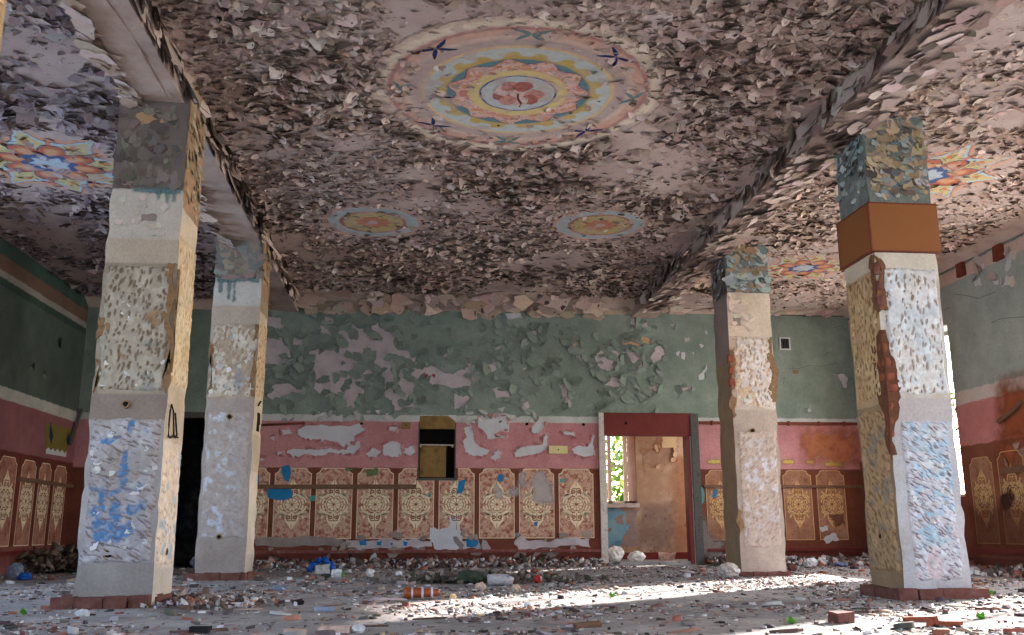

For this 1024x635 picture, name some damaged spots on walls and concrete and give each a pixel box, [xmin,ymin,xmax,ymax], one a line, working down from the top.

peeling [0,0,1024,463]
spalling [199,412,432,558]
peeling [453,529,491,555]
peeling [513,531,591,558]
spalling [736,428,782,548]
damp [801,430,859,467]
spalling [848,255,949,574]
spalling [901,421,963,582]